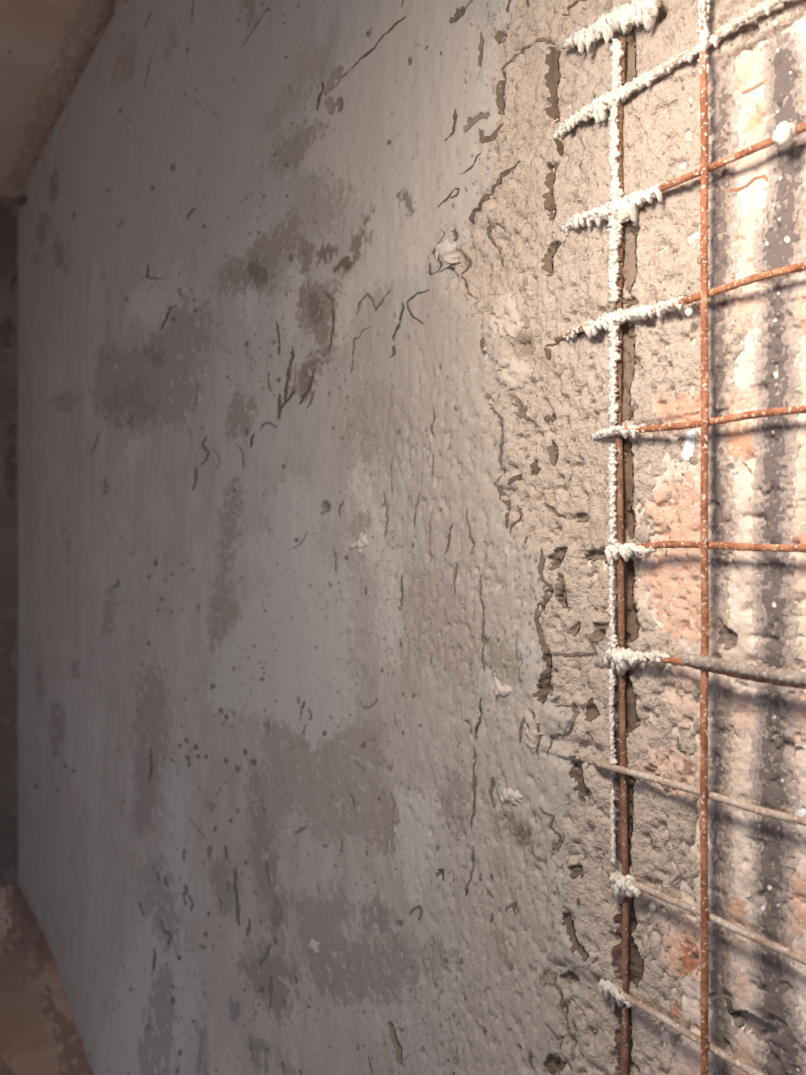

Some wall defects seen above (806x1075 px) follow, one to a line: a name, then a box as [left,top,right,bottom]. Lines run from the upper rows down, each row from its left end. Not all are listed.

crack [192,108,520,490]
spalling [463,71,506,132]
rust [718,174,768,192]
damp [708,24,806,671]
damp [206,711,457,1028]
crack [383,407,487,672]
crack [489,393,596,755]
spalling [532,650,553,703]
spalling [539,0,806,1075]
rust [675,934,700,981]
rust [681,756,698,775]
damp [700,675,806,1075]